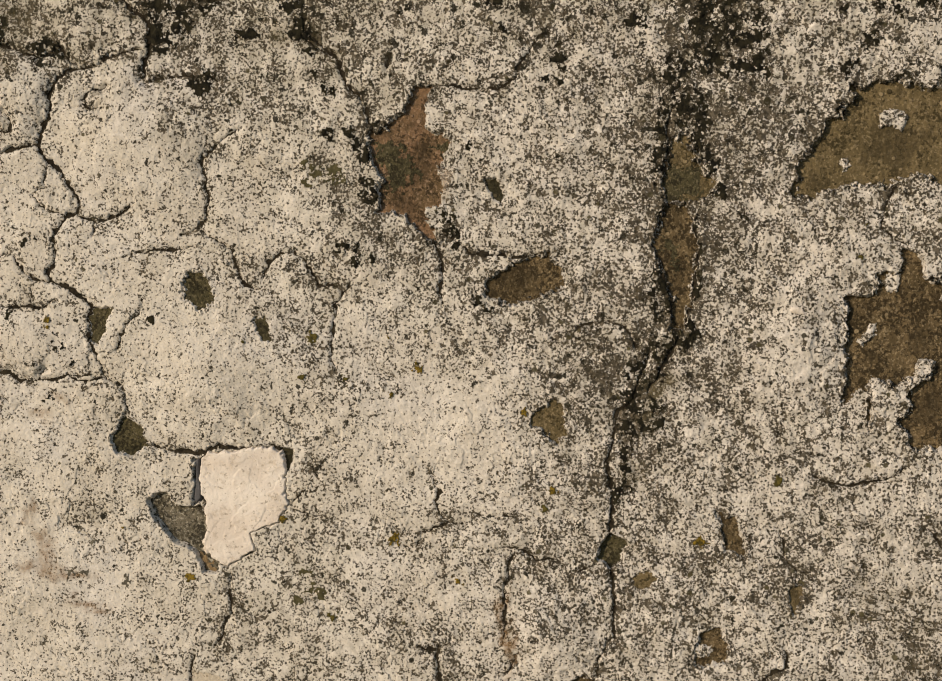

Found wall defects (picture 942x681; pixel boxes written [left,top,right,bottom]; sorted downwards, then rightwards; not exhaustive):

crack [0,0,219,413]
crack [130,128,350,369]
spalling [366,83,452,253]
spalling [483,250,567,308]
crack [575,109,700,535]
spalling [651,132,716,331]
spalling [790,67,942,202]
spalling [833,248,942,453]
spalling [147,491,220,574]
crack [148,443,282,456]
crack [405,471,516,547]
crack [497,546,617,678]